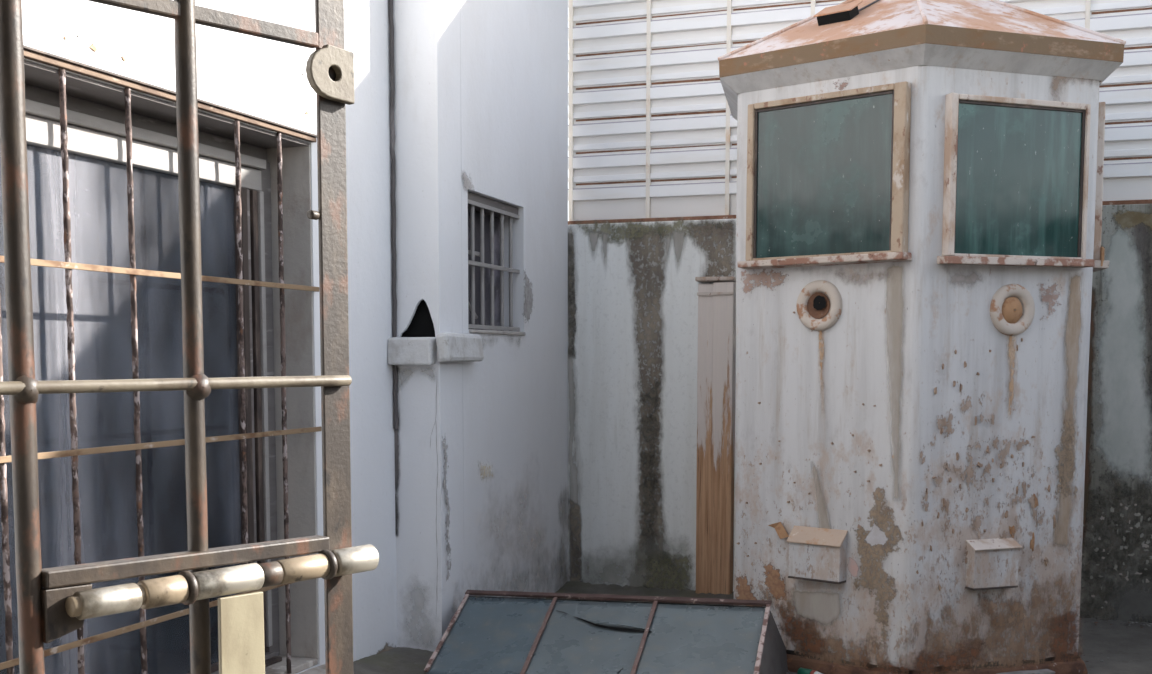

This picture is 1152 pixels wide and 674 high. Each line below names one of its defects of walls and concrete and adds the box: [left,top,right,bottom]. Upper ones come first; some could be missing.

damp [568,226,692,590]
peeling [847,471,901,648]
corrosion [764,574,1082,674]
damp [1080,211,1152,623]